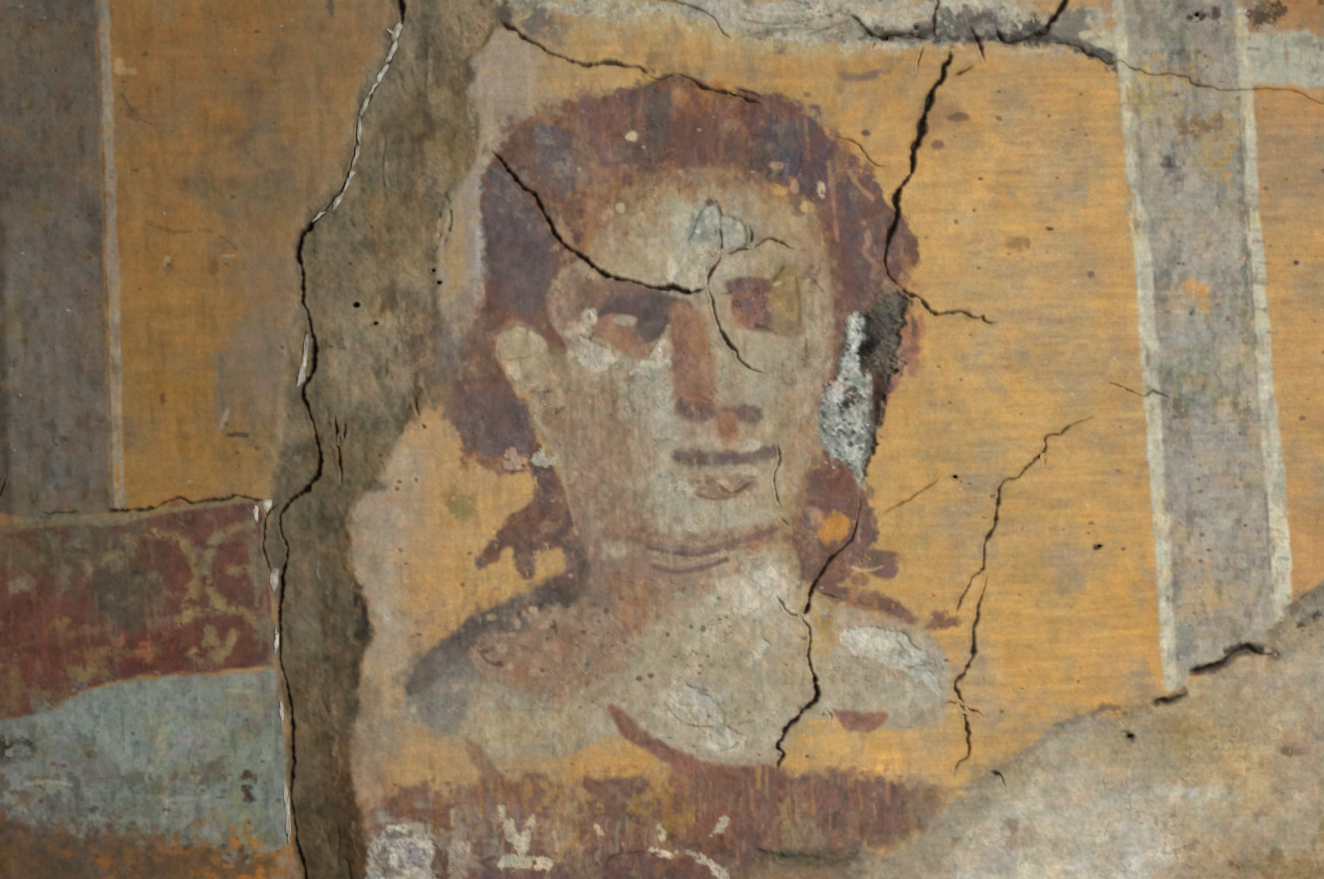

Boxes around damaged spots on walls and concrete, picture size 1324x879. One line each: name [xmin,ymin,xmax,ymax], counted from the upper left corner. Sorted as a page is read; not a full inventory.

crack [496,17,766,108]
crack [648,0,735,43]
crack [830,0,1324,328]
crack [488,147,797,378]
crack [0,474,10,501]
crack [37,0,409,879]
crack [771,473,943,773]
spalling [818,293,913,485]
peeling [840,626,943,696]
crack [941,378,1174,789]
spalling [1286,583,1324,626]